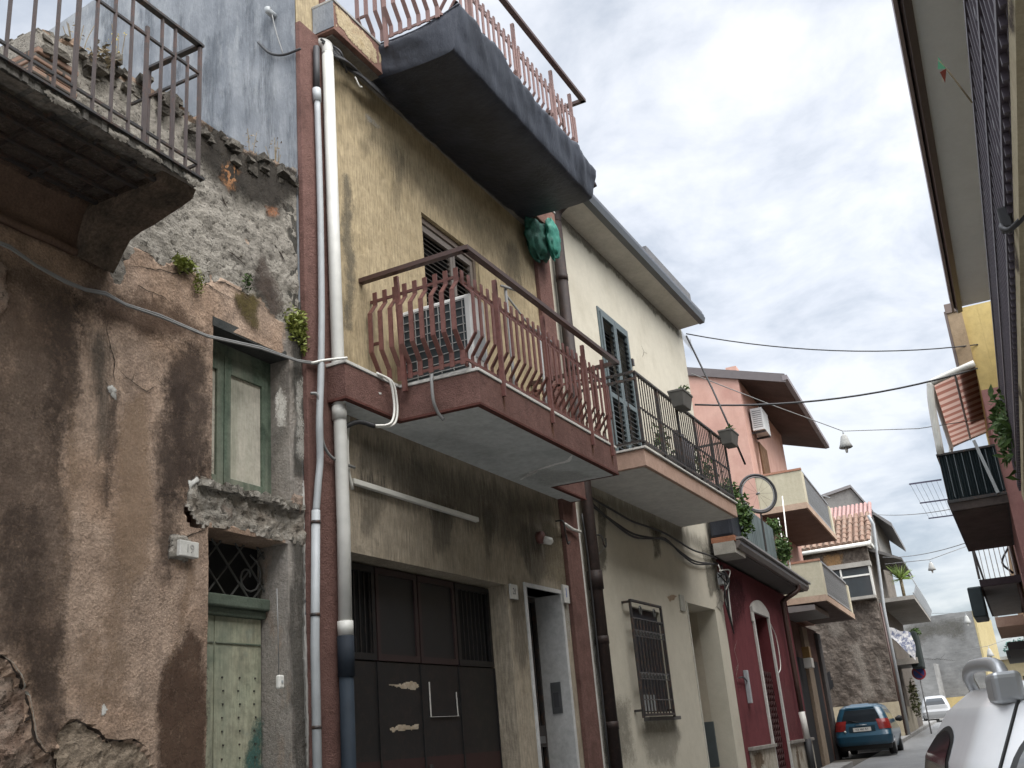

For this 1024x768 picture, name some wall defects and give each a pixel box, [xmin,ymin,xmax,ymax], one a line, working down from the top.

peeling [44,45,299,322]
damp [77,271,213,583]
spalling [188,476,306,531]
crack [0,654,146,754]
spalling [0,672,152,768]
damp [156,619,208,768]